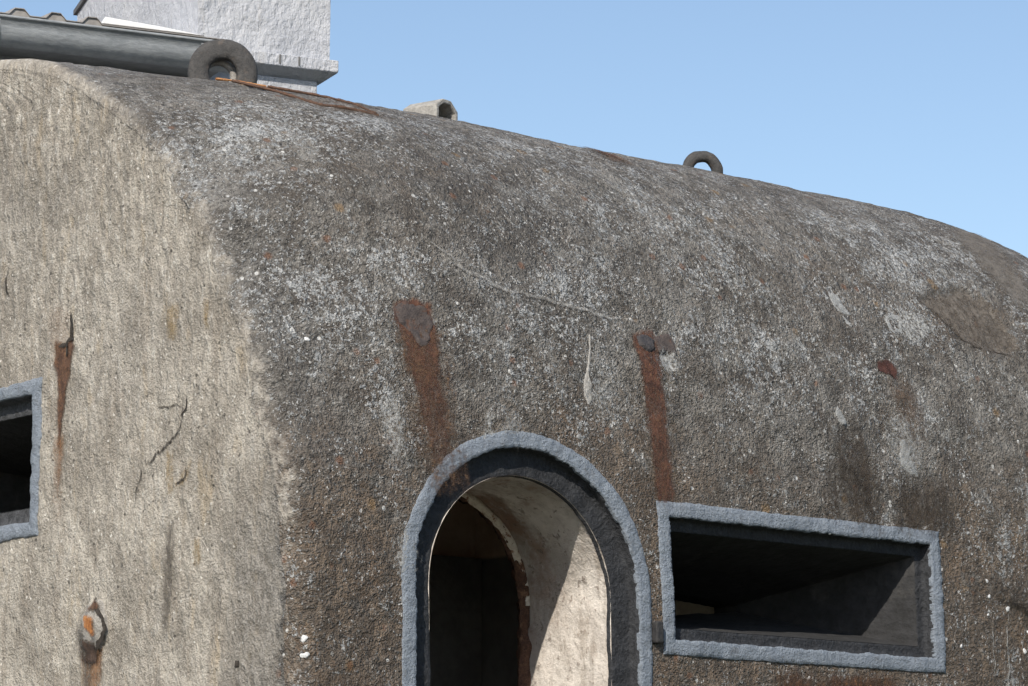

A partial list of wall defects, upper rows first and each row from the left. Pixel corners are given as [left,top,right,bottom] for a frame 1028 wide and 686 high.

rust [54,340,74,491]
crack [135,398,187,501]
rust [392,298,468,486]
rust [633,330,677,501]
rust [877,359,916,420]
rust [84,649,101,686]